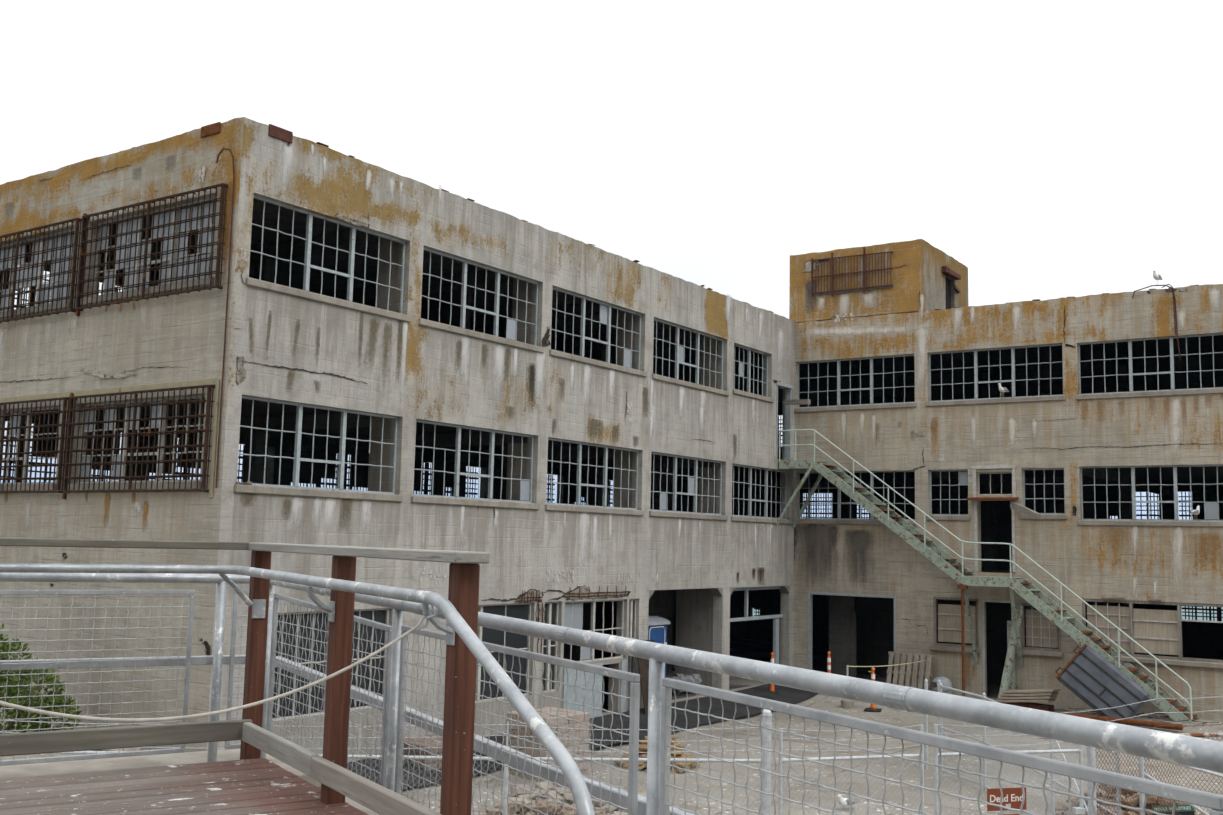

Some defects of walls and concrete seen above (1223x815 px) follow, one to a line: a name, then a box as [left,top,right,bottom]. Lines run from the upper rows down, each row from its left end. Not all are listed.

damp [806,280,824,310]
damp [1210,288,1220,309]
damp [954,306,975,331]
damp [1013,305,1021,330]
damp [812,294,926,387]
crack [246,361,368,384]
damp [841,411,876,444]
damp [1009,418,1017,445]
damp [1171,398,1181,454]
damp [1173,526,1183,585]